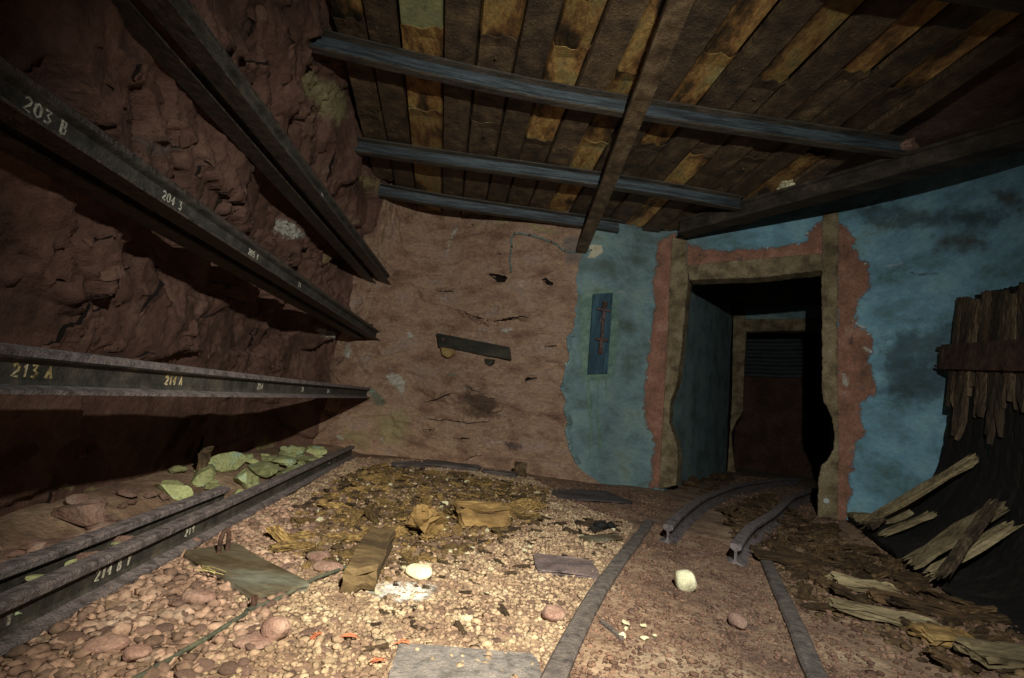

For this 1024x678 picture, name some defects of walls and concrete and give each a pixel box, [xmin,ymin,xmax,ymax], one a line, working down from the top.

flaking render [687,221,823,265]
crack [435,287,557,348]
peeling [559,318,581,464]
flaking render [643,233,676,488]
flaking render [837,224,876,521]